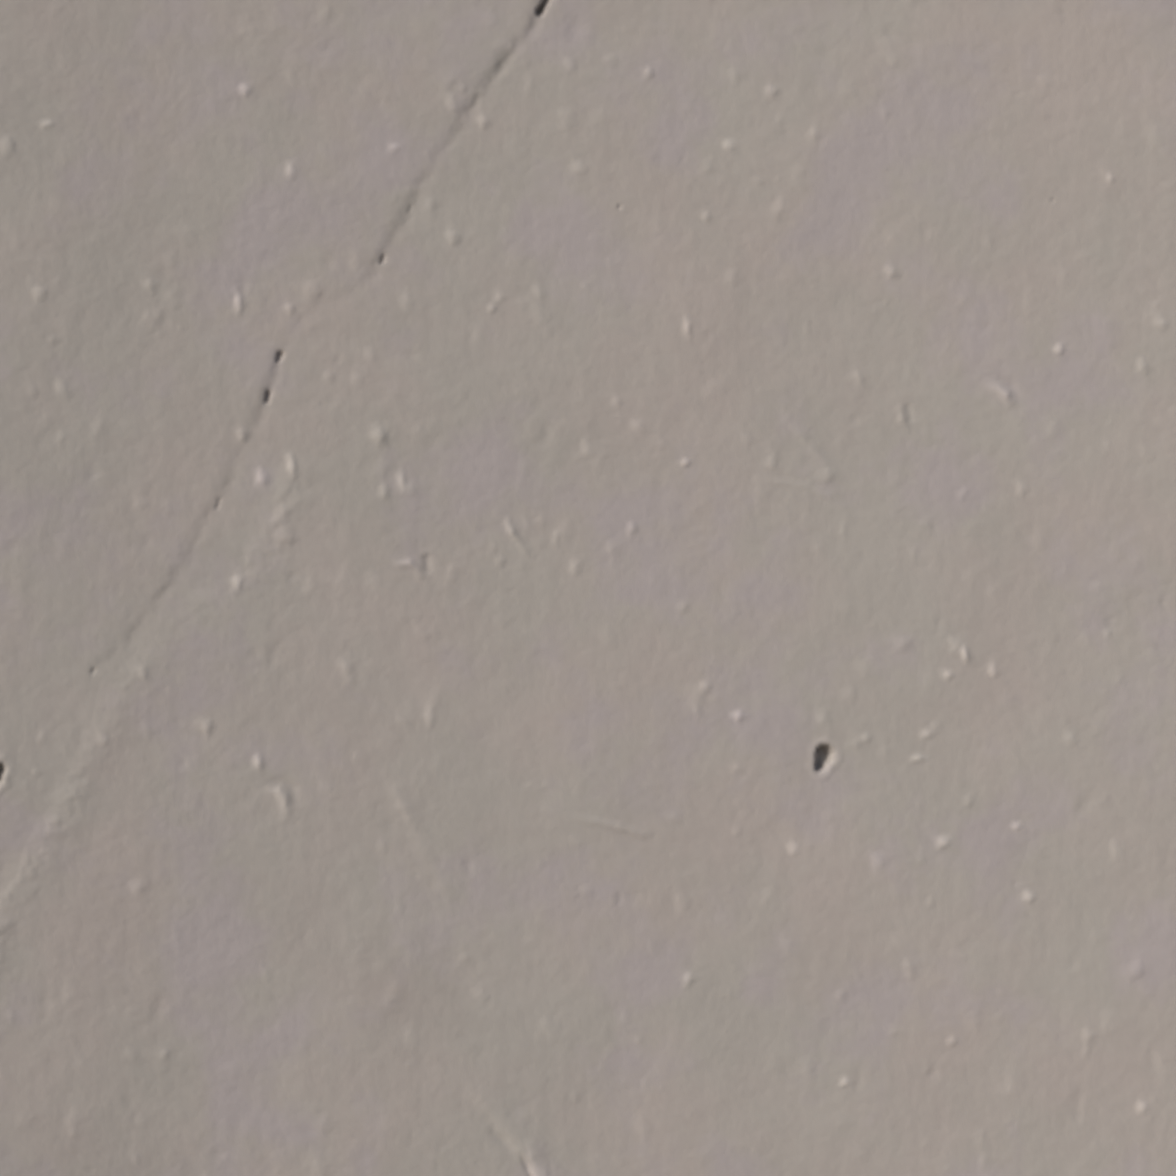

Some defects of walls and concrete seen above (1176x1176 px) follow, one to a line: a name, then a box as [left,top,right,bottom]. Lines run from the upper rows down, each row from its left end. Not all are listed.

crack [82,0,557,681]